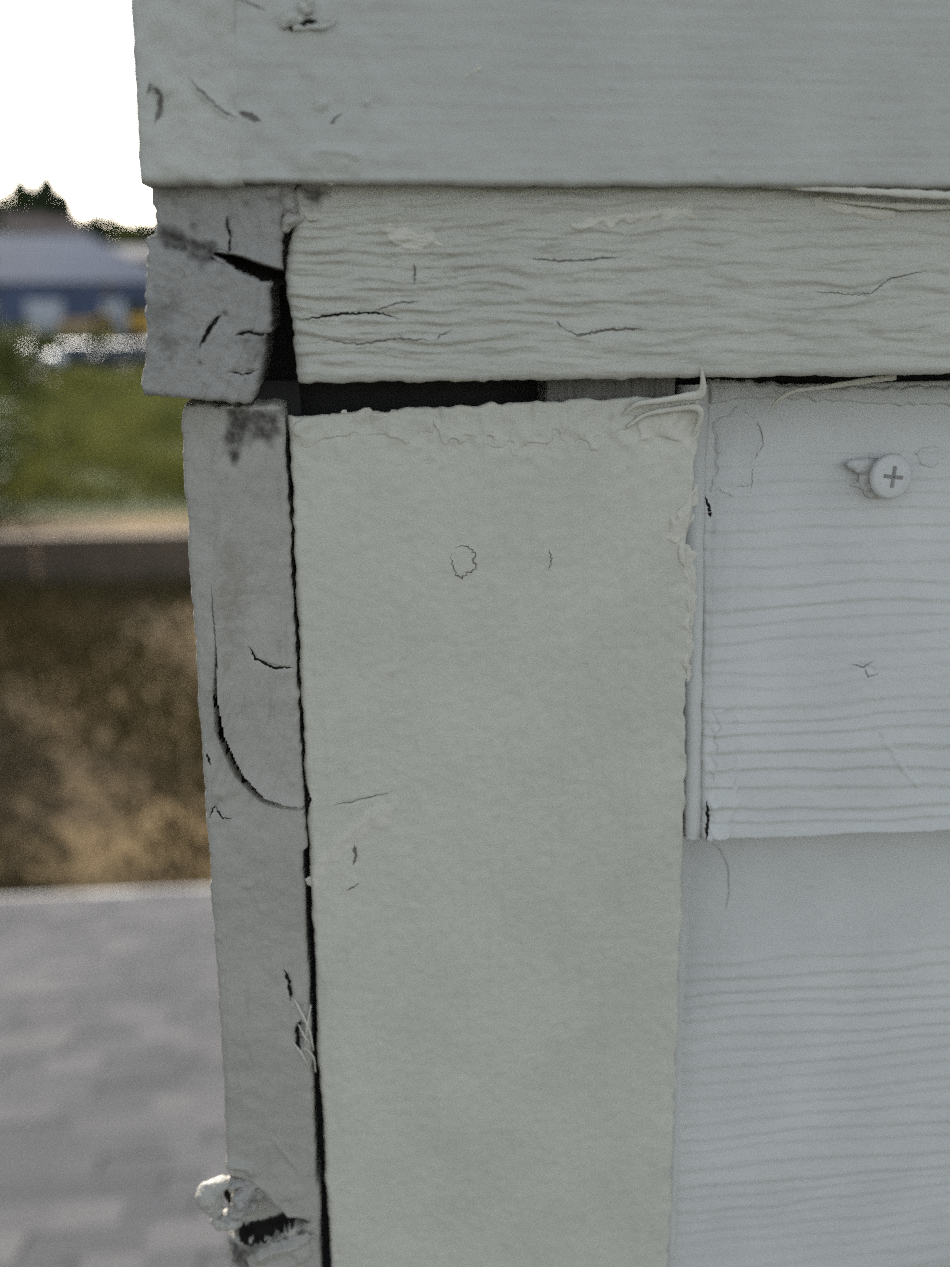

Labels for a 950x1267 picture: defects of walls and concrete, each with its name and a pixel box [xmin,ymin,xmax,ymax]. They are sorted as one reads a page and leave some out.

crack [200,315,274,348]
peeling [292,366,707,455]
crack [206,588,268,800]
crack [249,647,293,670]
crack [305,783,393,809]
peeling [706,704,743,843]
crack [284,970,316,1072]